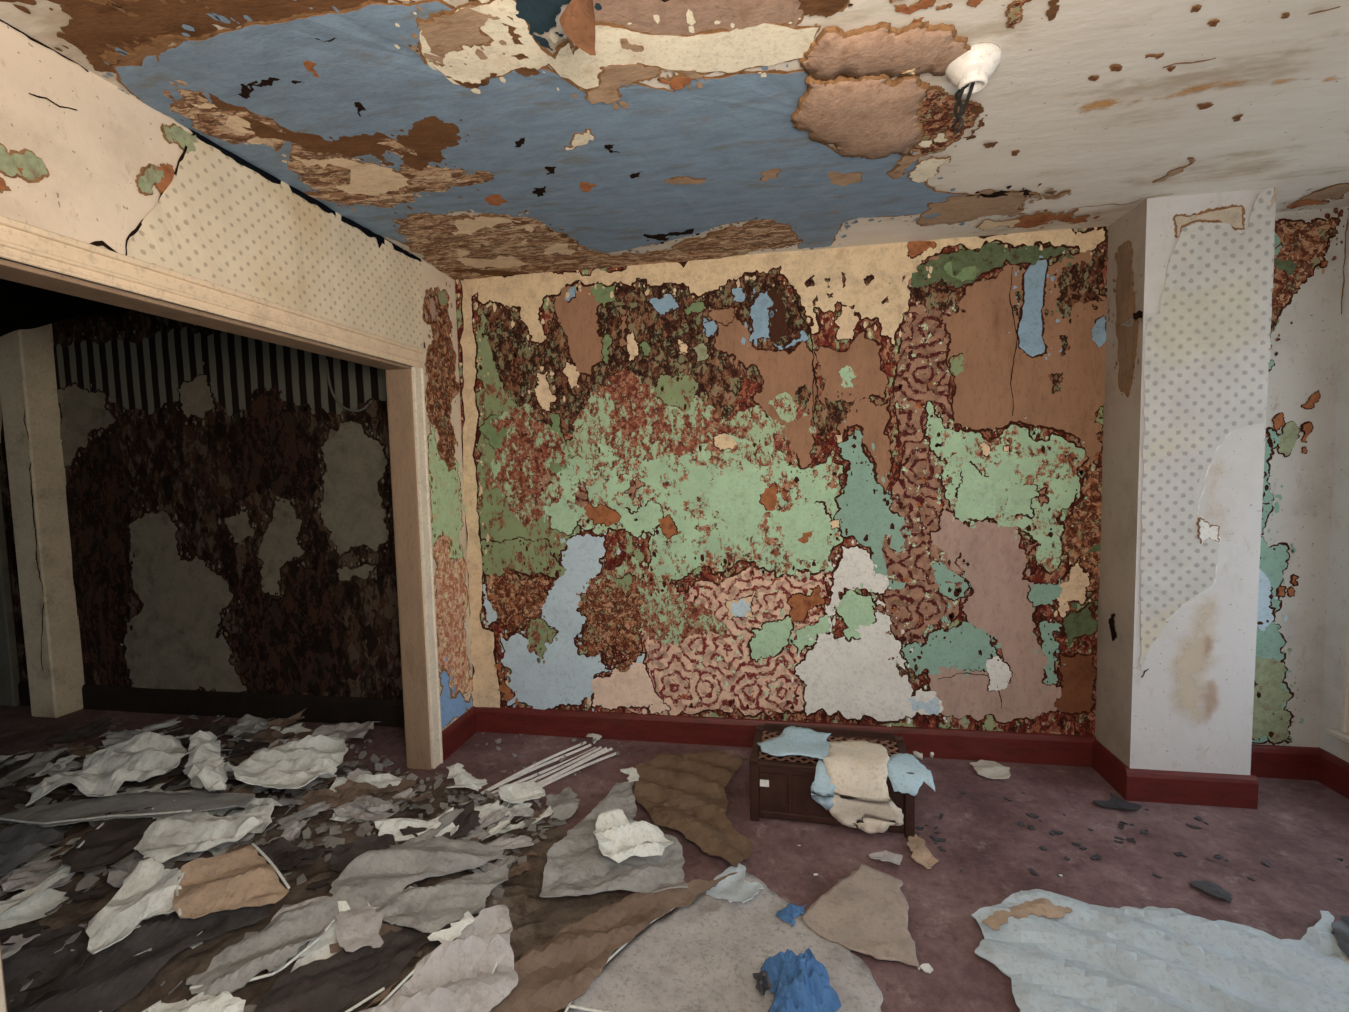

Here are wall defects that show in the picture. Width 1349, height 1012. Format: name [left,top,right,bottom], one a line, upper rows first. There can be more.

peeling [1145,53,1176,72]
peeling [1191,4,1220,27]
crack [90,128,421,262]
peeling [1273,233,1297,288]
peeling [0,0,1143,729]
peeling [1252,390,1321,746]